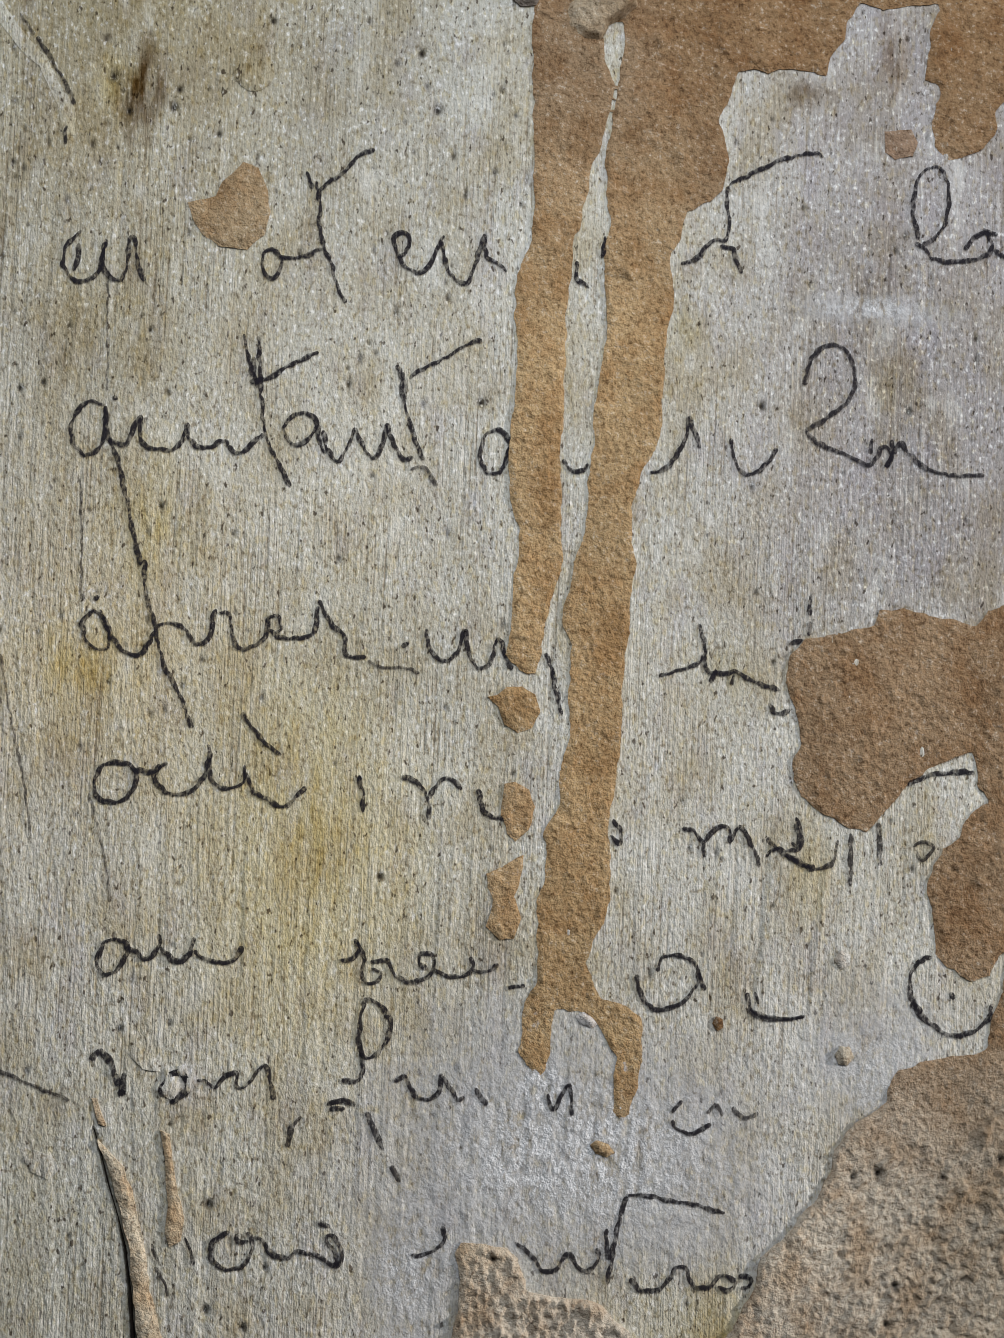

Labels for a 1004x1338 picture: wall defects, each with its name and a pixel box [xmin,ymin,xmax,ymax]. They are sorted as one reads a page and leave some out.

peeling [188,162,271,250]
peeling [486,0,1004,1119]
spalling [451,1242,631,1338]
peeling [725,605,1004,1338]